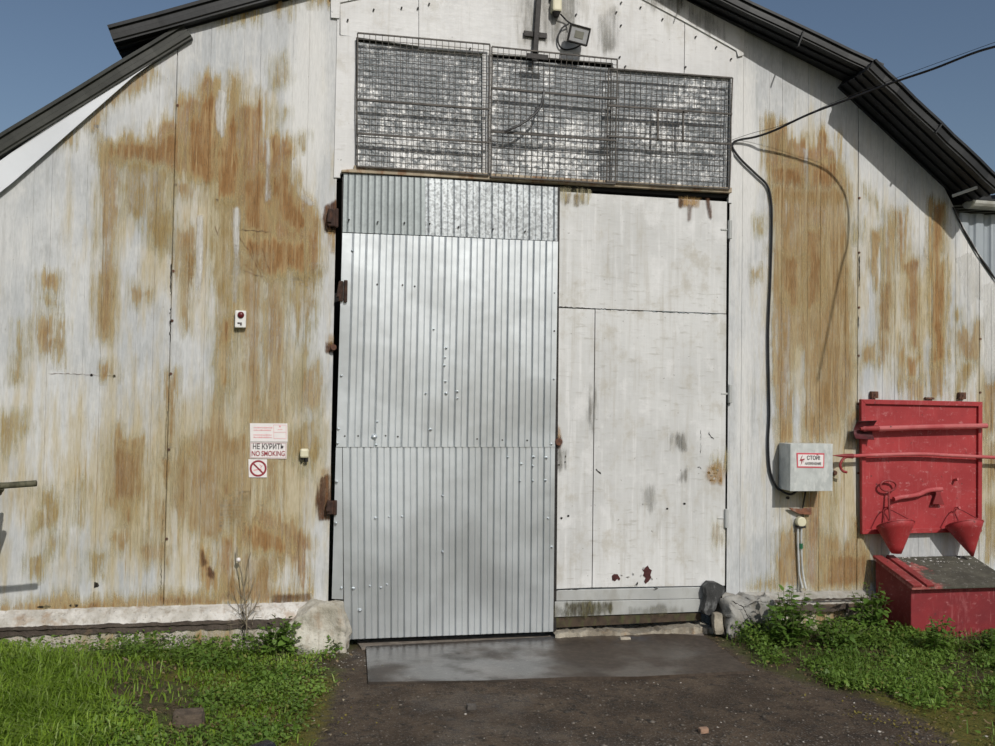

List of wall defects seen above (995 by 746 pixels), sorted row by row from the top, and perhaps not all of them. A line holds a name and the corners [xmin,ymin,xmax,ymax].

corrosion [679,198,712,218]
corrosion [0,65,337,611]
corrosion [752,115,981,446]
peeling [612,566,653,584]
corrosion [754,477,876,592]